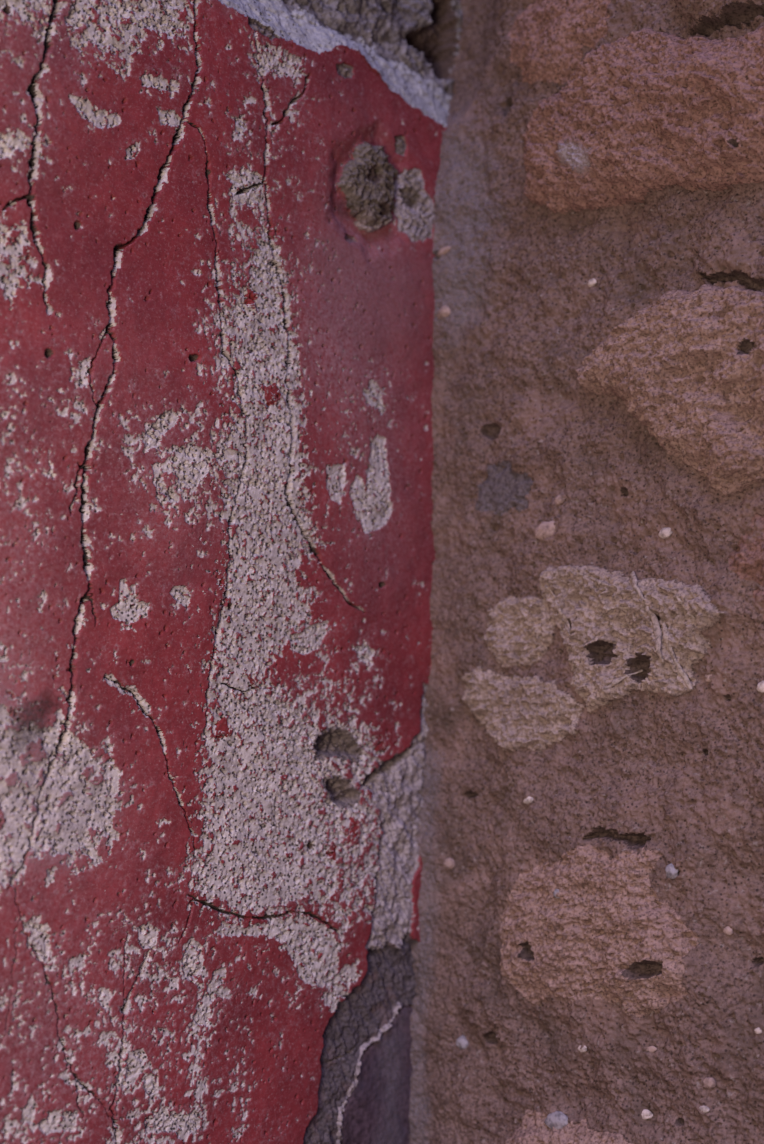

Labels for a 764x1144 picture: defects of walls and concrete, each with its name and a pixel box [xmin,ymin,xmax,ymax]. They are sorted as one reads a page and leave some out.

peeling [69,94,121,130]
peeling [0,0,201,92]
spalling [218,0,463,128]
spalling [336,135,435,243]
peeling [0,210,43,309]
peeling [100,578,147,630]
crack [5,0,363,1144]
peeling [103,673,150,717]
peeling [143,168,429,1144]
peeling [0,669,134,895]
peeling [137,921,160,949]
peeling [22,1096,78,1139]